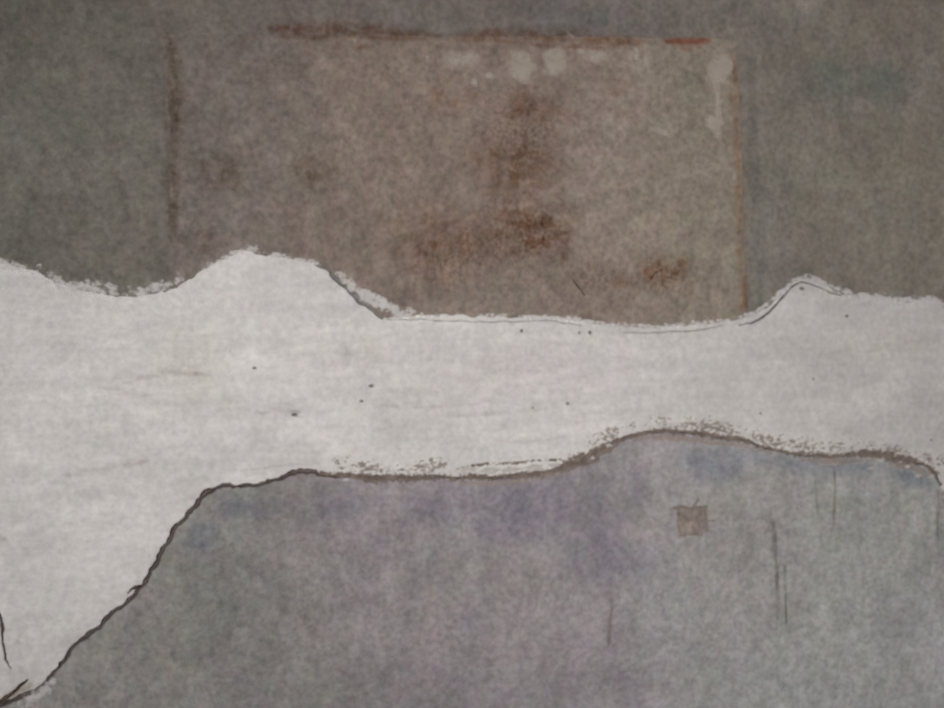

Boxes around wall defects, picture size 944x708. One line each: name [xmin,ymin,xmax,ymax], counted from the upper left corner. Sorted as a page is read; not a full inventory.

crack [315,264,581,326]
crack [623,282,842,334]
spalling [319,417,944,502]